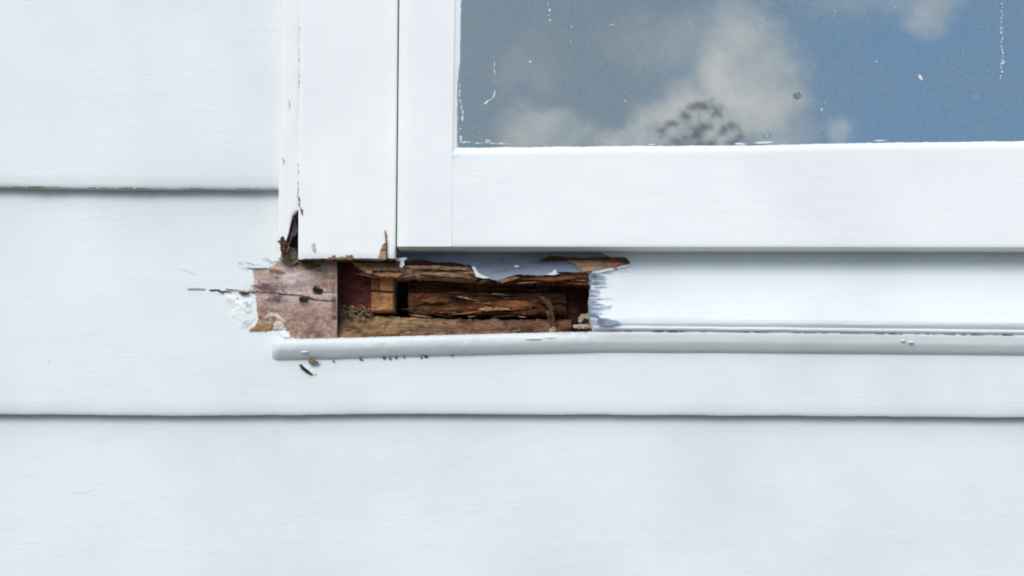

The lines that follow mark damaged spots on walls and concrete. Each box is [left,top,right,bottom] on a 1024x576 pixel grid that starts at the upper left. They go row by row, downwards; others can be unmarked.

crack [187,258,336,301]
peeling [240,214,353,339]
peeling [539,256,632,275]